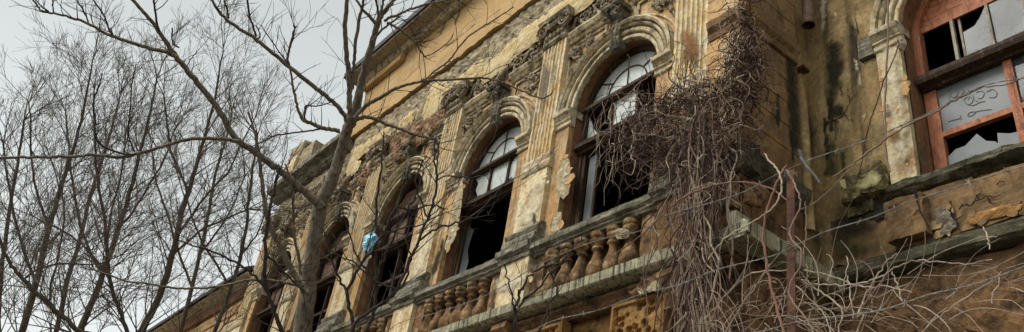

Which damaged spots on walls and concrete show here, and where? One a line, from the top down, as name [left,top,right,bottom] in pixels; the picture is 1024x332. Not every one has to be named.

spalling [276,0,595,217]
leakage [776,0,811,160]
leakage [823,41,844,160]
peeling [516,154,576,236]
spalling [931,199,1023,240]